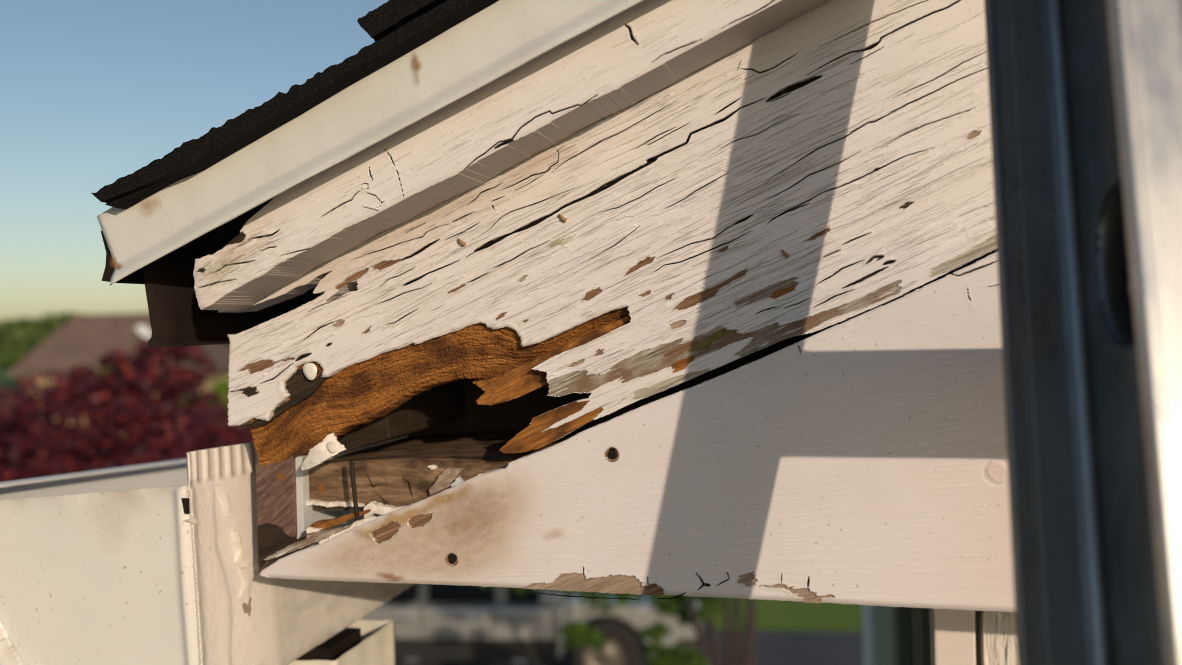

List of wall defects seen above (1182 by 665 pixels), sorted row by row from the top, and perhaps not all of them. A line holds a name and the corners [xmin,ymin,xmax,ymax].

crack [323,149,404,216]
crack [351,0,987,324]
crack [199,229,311,288]
peeling [230,357,294,397]
crack [262,294,349,383]
peeling [499,270,901,454]
peeling [301,433,346,470]
peeling [372,513,433,544]
peeling [523,573,665,595]
peeling [738,572,834,603]